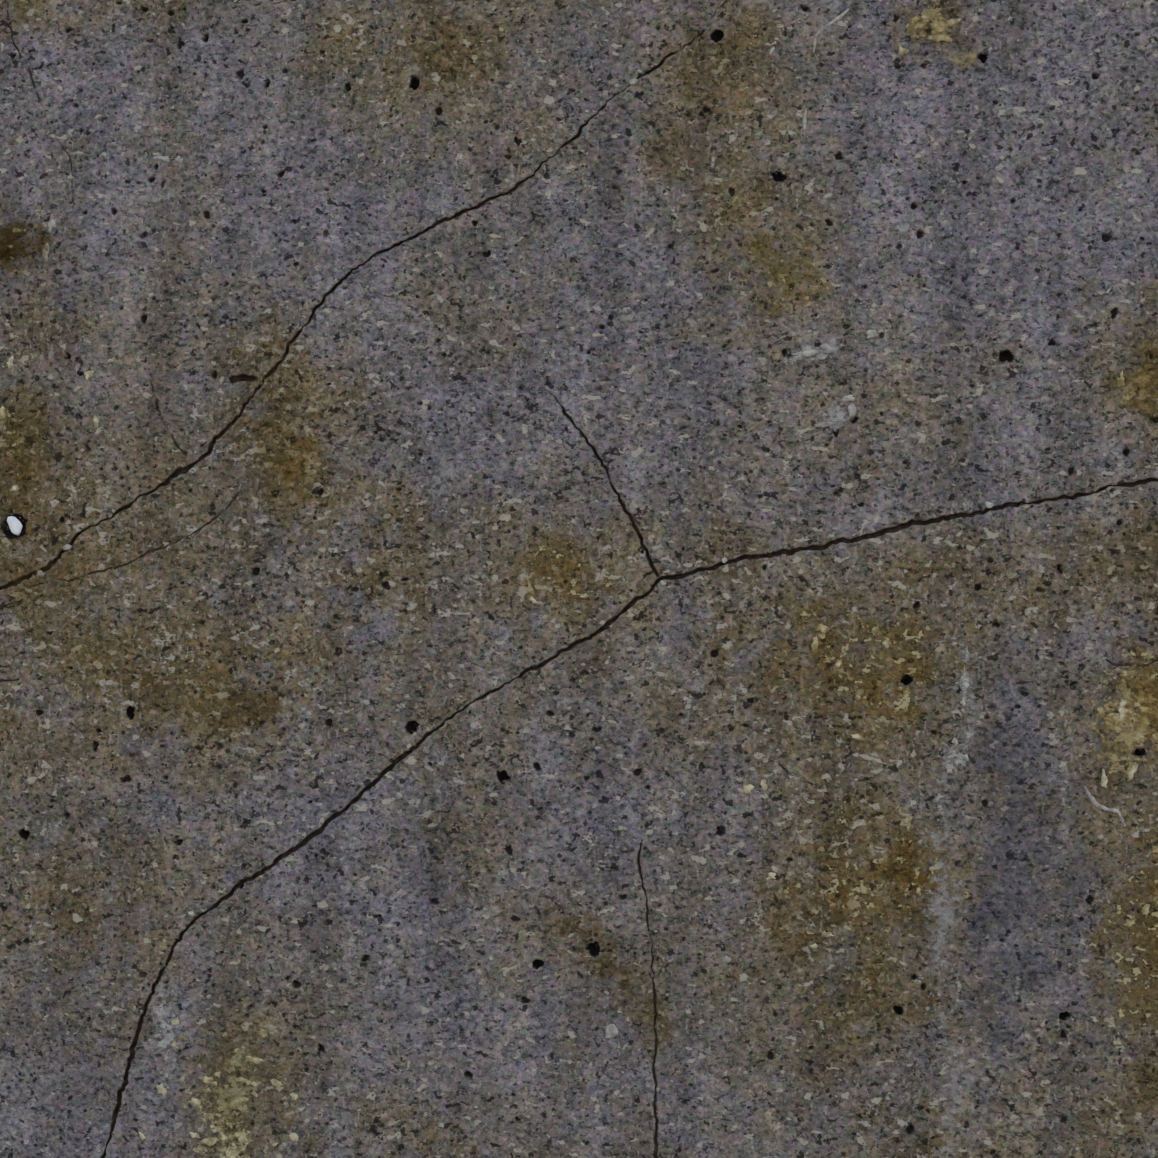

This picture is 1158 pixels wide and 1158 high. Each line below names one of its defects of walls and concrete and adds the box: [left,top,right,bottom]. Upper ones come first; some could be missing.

crack [0,0,727,609]
crack [101,382,1158,1158]